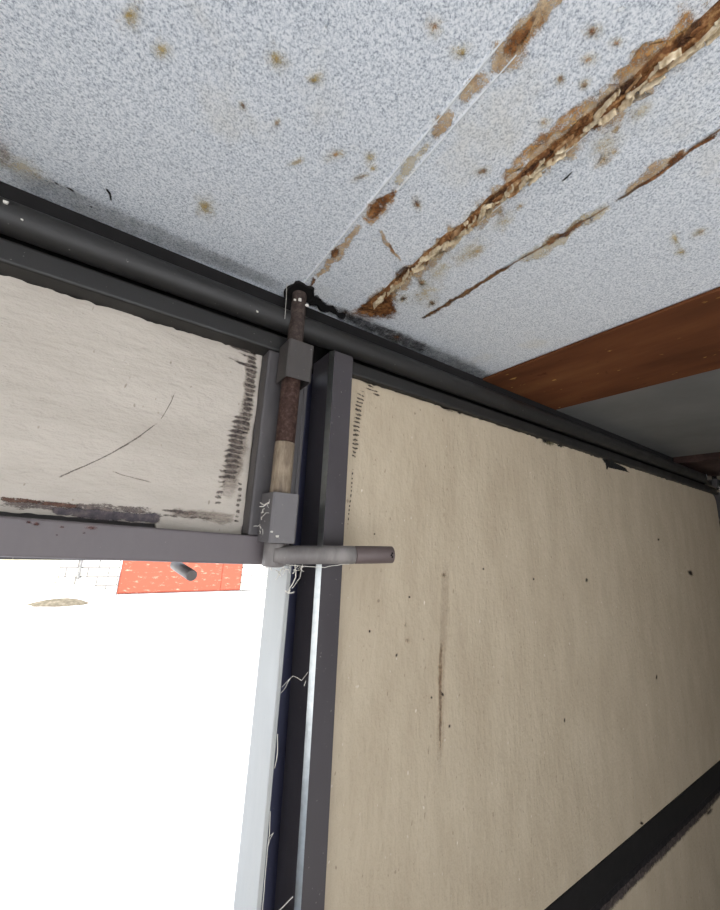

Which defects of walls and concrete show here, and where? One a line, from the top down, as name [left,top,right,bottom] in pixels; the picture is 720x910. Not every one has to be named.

rust [310,0,720,319]